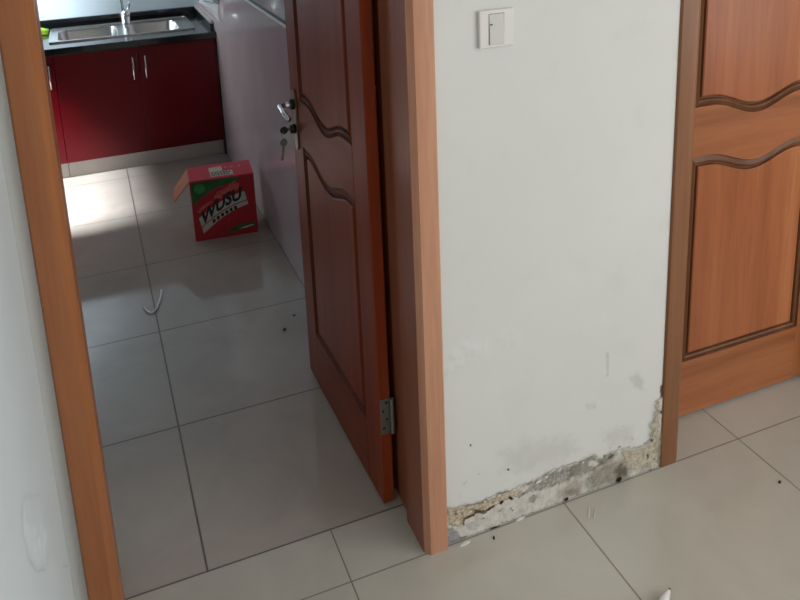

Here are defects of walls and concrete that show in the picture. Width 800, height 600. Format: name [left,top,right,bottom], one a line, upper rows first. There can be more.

flaking render [447,397,662,543]